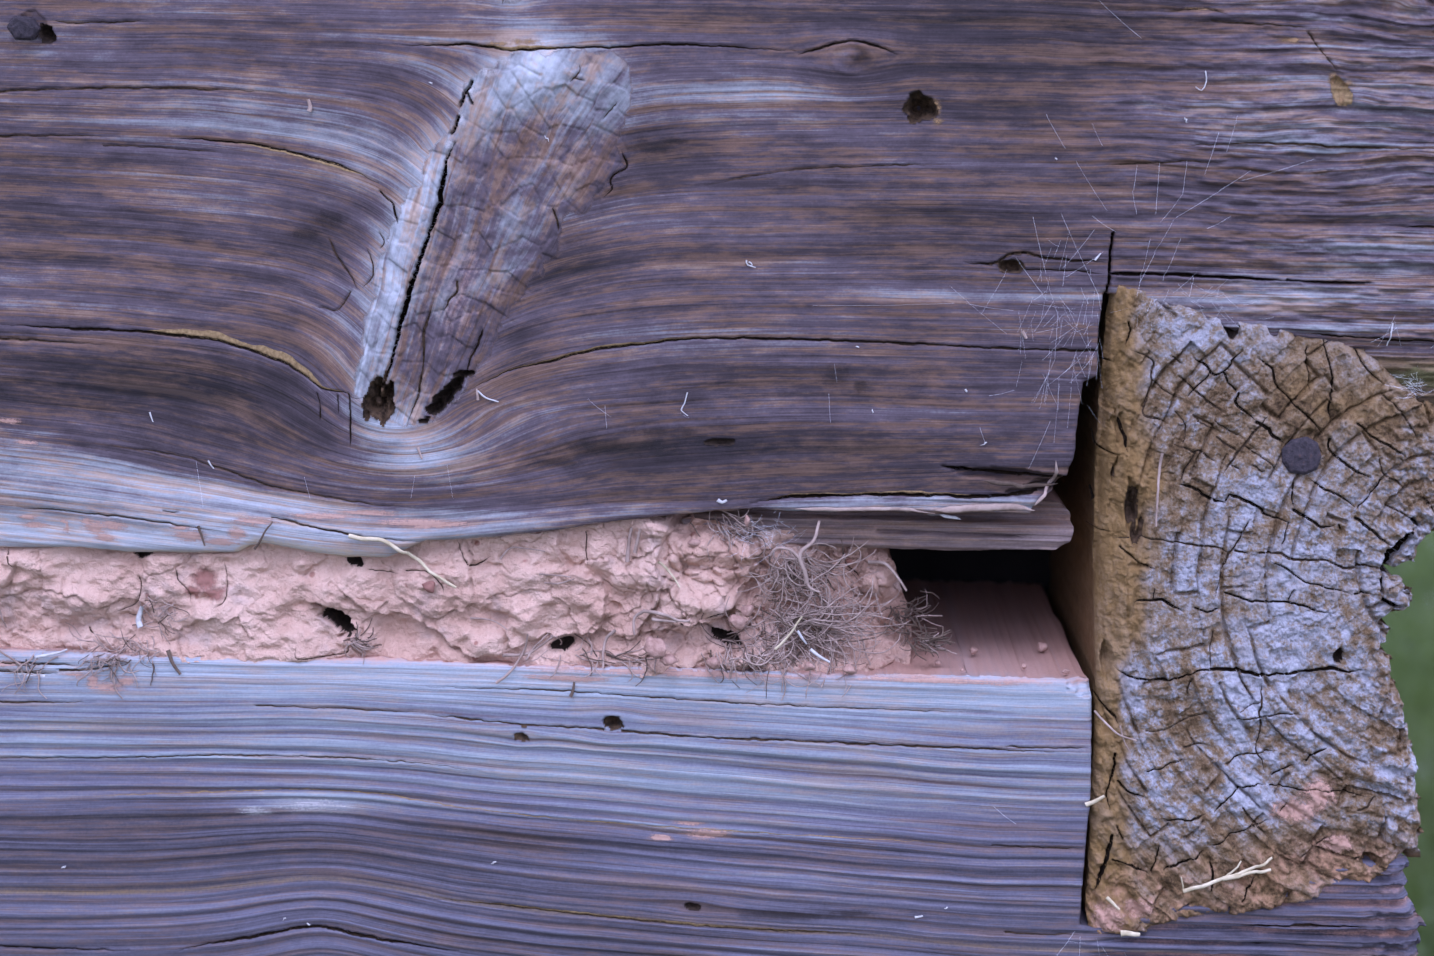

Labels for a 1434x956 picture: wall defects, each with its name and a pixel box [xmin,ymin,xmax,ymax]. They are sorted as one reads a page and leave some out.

crack [55,18,146,26]
crack [403,40,893,81]
crack [604,152,628,197]
crack [704,164,940,186]
crack [0,81,473,443]
crack [0,322,1434,946]